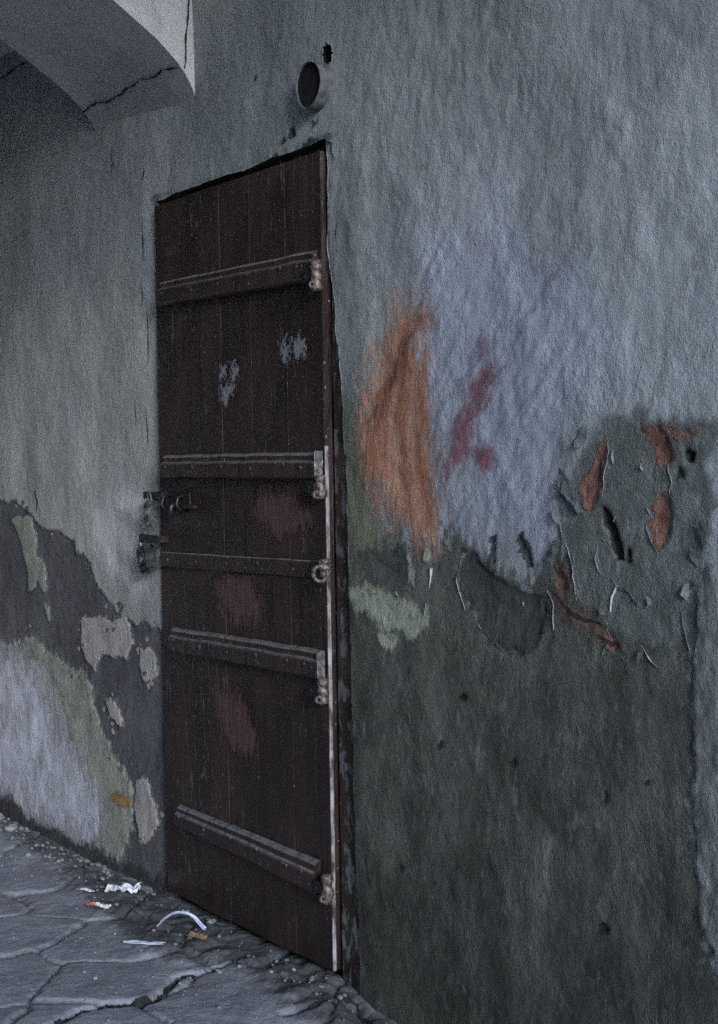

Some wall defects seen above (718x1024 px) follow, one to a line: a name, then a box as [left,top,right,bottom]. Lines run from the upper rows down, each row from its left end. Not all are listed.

crack [83,0,190,113]
flaking render [0,499,170,893]
flaking render [348,405,718,1024]